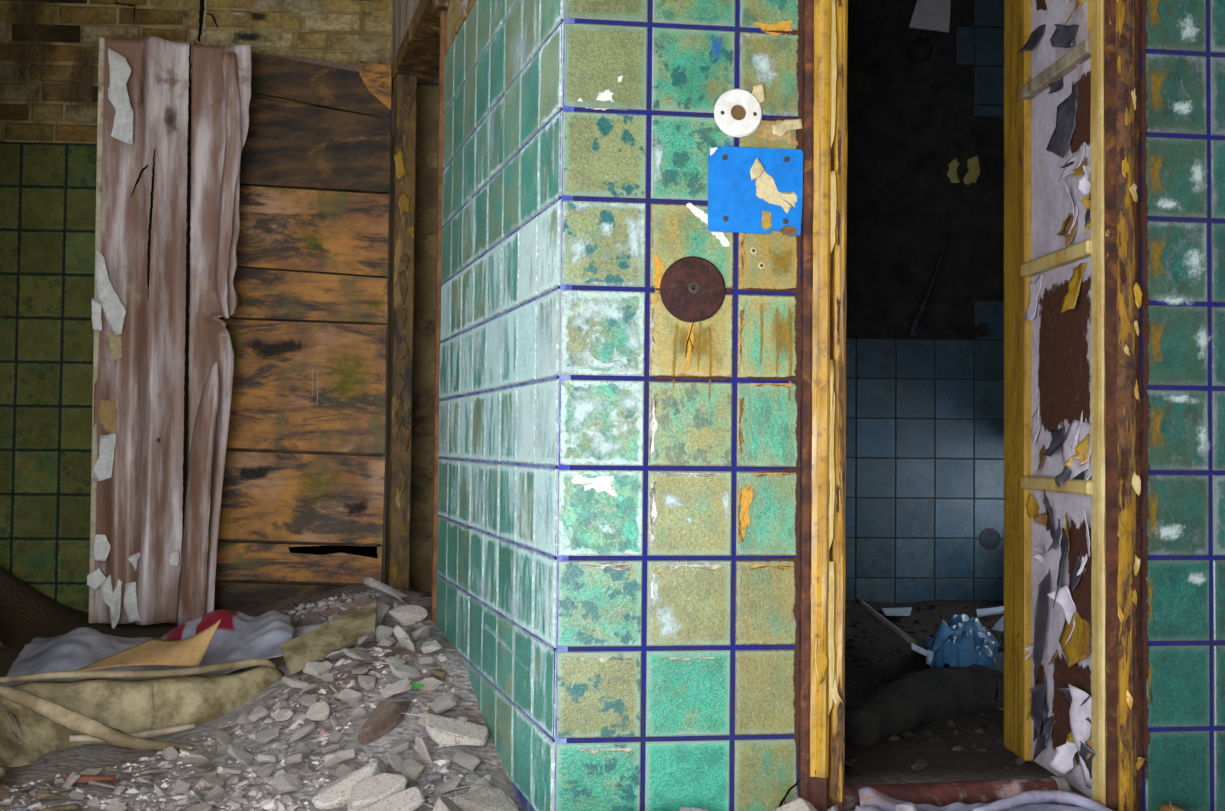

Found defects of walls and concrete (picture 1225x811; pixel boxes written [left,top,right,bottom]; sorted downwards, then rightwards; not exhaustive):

crack [197,0,218,42]
peeling [1016,0,1091,54]
peeling [1125,88,1137,126]
peeling [1046,71,1092,247]
peeling [1122,157,1138,202]
rust [653,246,665,304]
peeling [1123,283,1143,356]
rust [654,323,730,398]
rust [746,0,814,805]
rust [1119,0,1162,811]
peeling [1132,472,1141,496]
peeling [1118,555,1141,623]